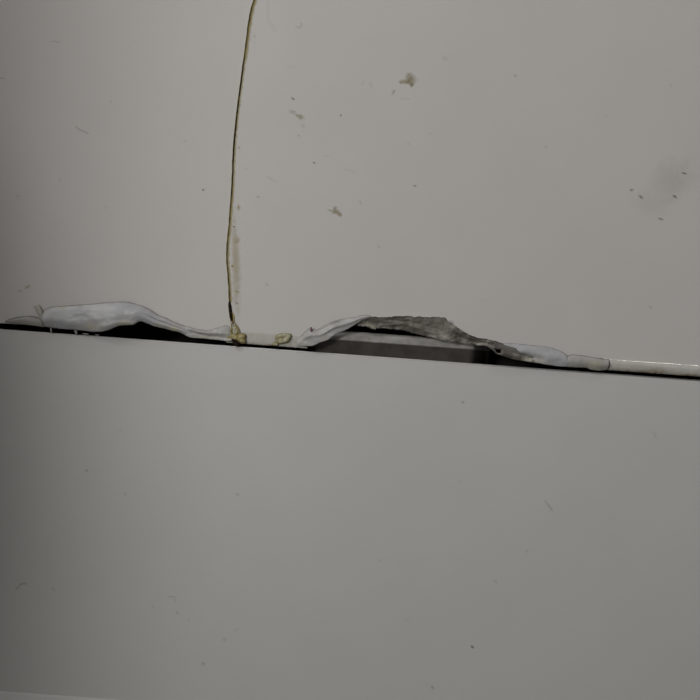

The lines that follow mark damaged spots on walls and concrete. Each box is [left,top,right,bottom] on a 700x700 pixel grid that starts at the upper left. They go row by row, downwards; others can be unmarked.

crack [225,0,256,334]
peeling [297,315,609,371]